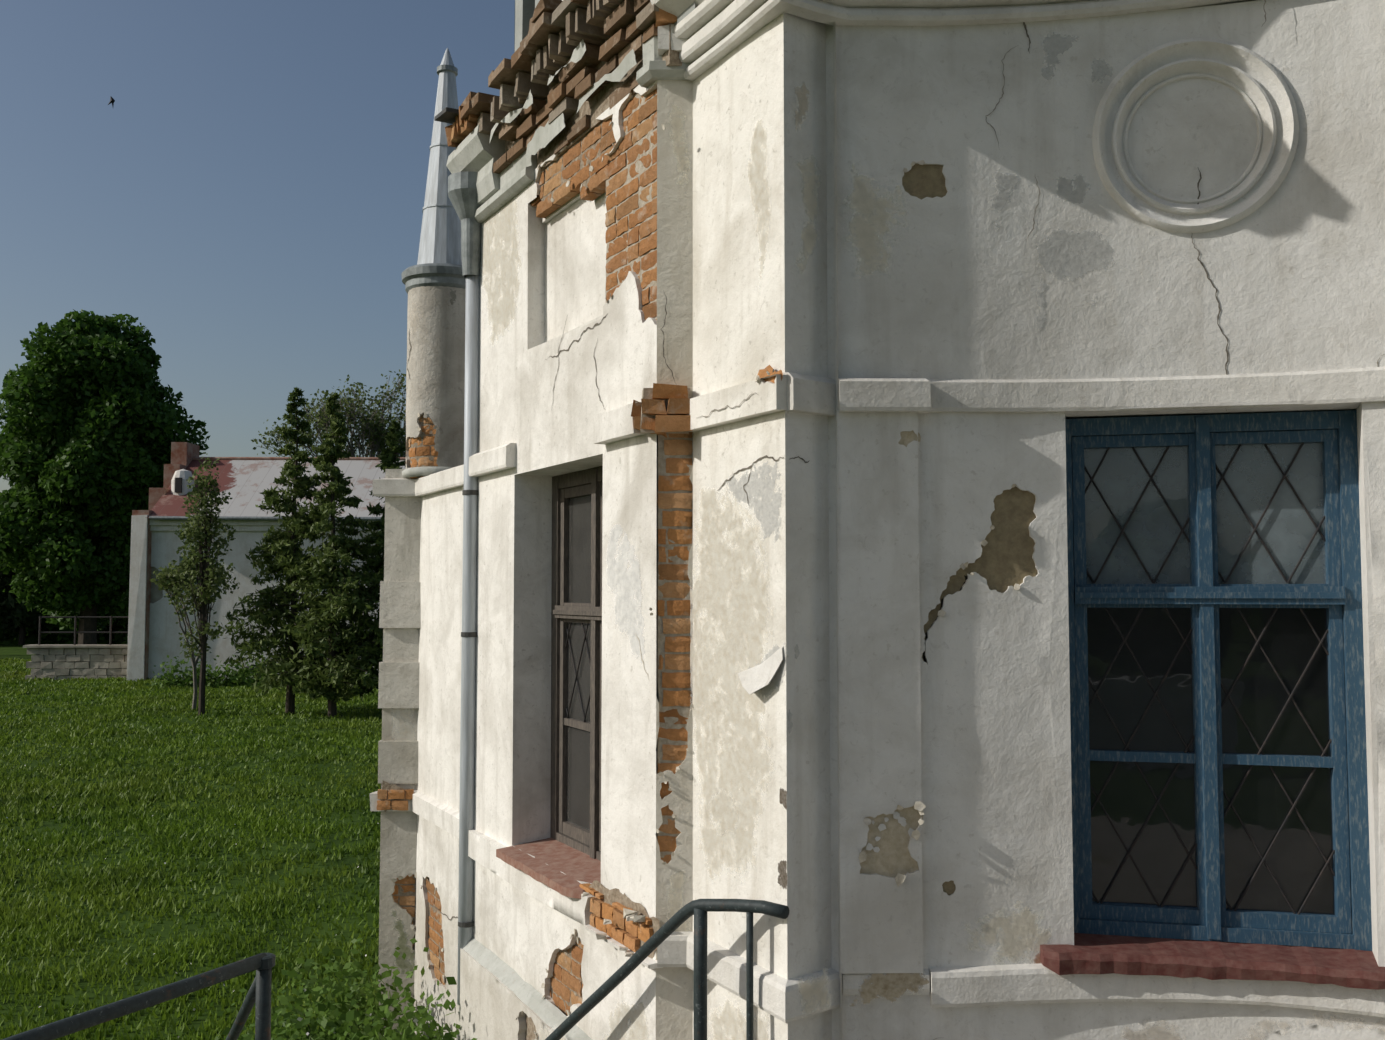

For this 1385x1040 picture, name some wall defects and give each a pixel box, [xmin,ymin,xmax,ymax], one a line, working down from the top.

crack [986,22,1031,150]
spalling [445,0,666,320]
spalling [902,160,947,200]
crack [1028,177,1041,237]
crack [545,314,607,410]
flaking render [631,383,695,436]
crack [1191,236,1229,375]
crack [717,455,810,508]
spalling [922,484,1038,661]
flaking render [656,766,681,865]
flaking render [391,872,446,985]
flaking render [541,880,660,1016]